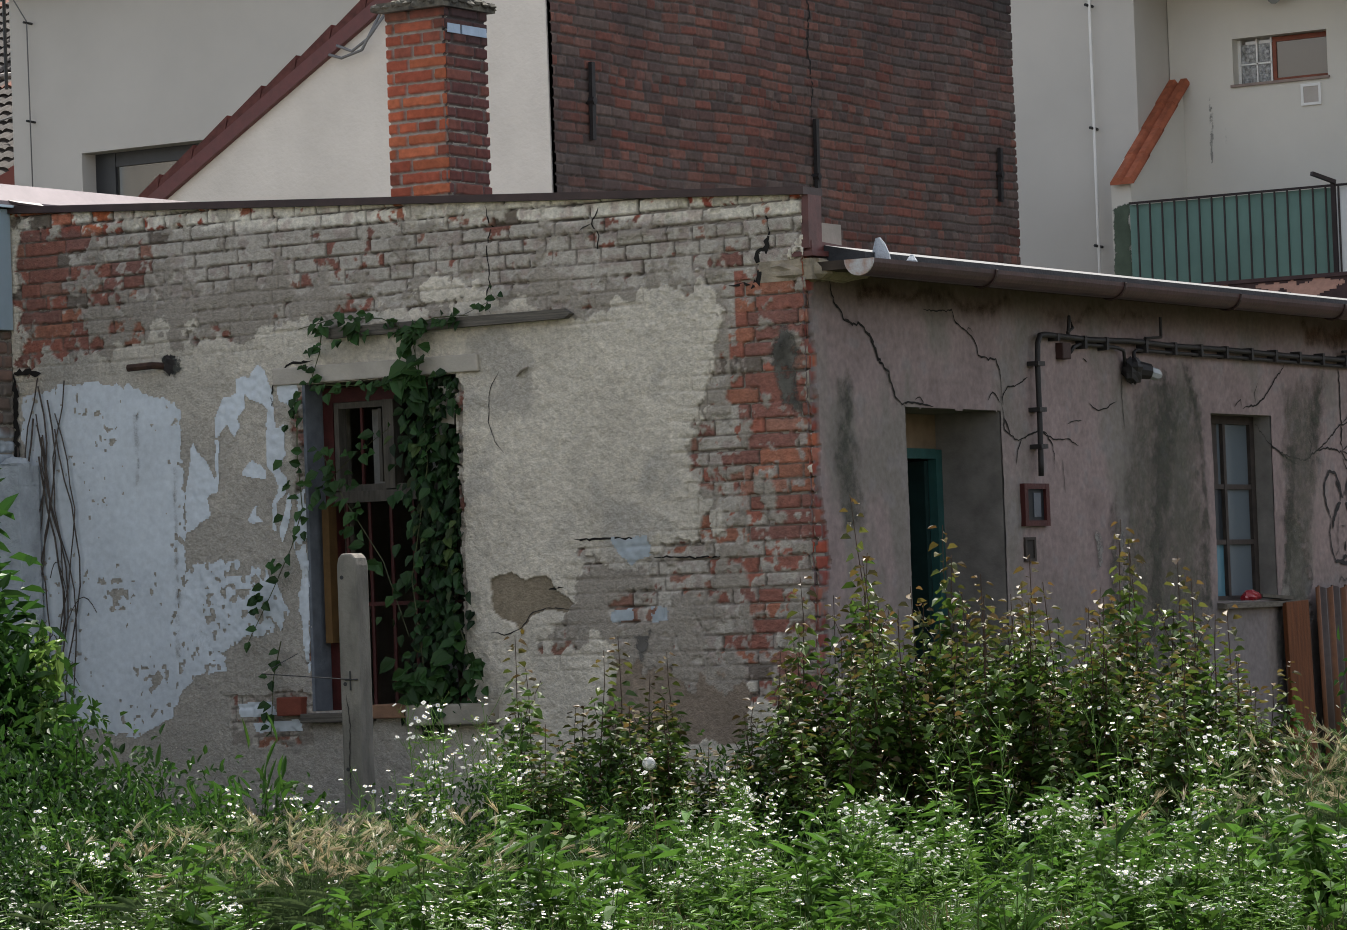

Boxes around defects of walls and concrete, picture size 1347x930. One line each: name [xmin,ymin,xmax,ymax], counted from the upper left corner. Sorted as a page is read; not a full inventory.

peeling [1256,277,1345,295]
spalling [10,195,832,747]
crack [923,309,1125,484]
leakage [1095,378,1212,695]
crack [1235,366,1347,469]